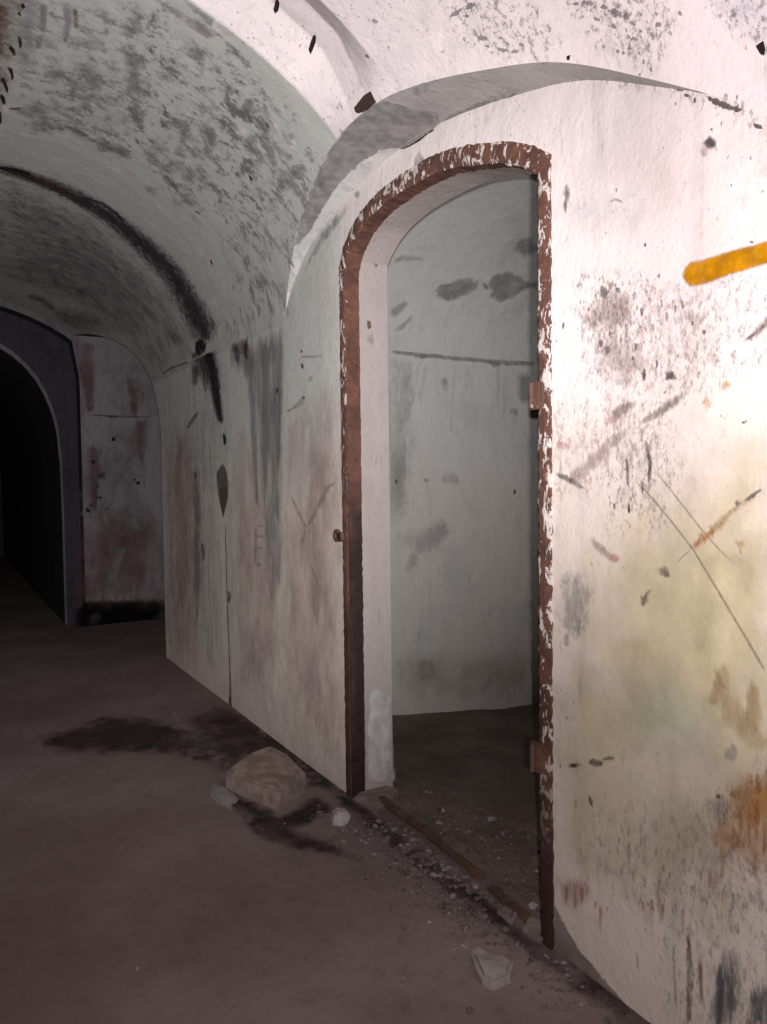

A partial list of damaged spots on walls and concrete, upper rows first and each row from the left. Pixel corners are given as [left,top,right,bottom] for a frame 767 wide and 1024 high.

water stain [238,336,281,554]